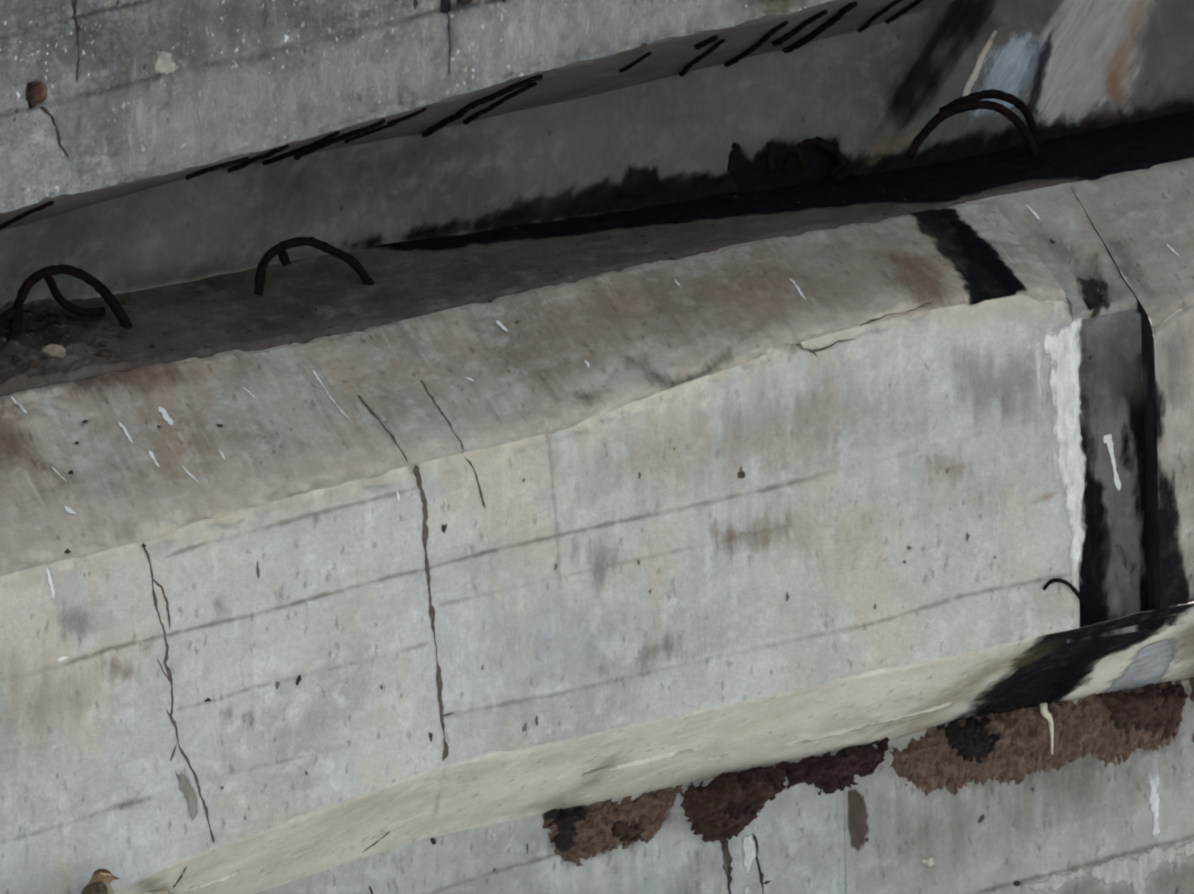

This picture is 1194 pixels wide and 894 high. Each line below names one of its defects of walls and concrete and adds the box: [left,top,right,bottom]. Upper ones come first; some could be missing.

rust [26,81,47,110]
leakage [352,0,1194,305]
spalling [0,264,133,342]
crack [143,543,215,843]
crack [358,395,455,761]
crack [421,381,485,508]
leakage [958,319,1194,720]
crack [720,834,771,894]